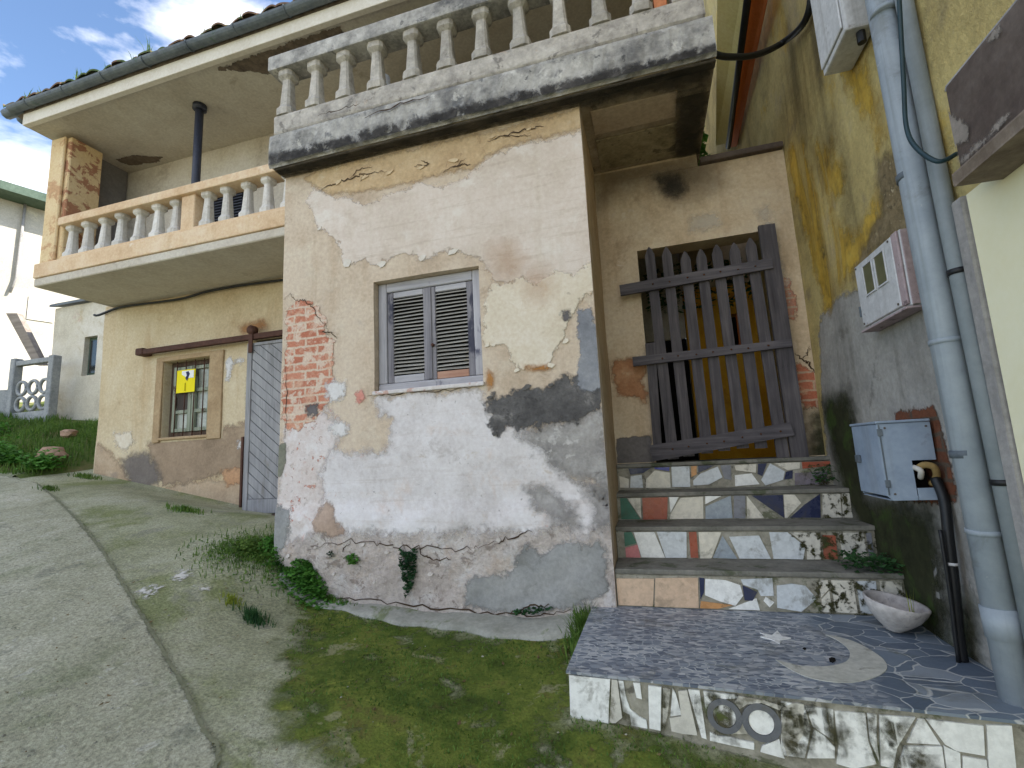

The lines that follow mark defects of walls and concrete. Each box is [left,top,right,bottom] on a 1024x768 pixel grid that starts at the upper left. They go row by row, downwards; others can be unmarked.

peeling [304,107,593,372]
peeling [274,300,616,618]